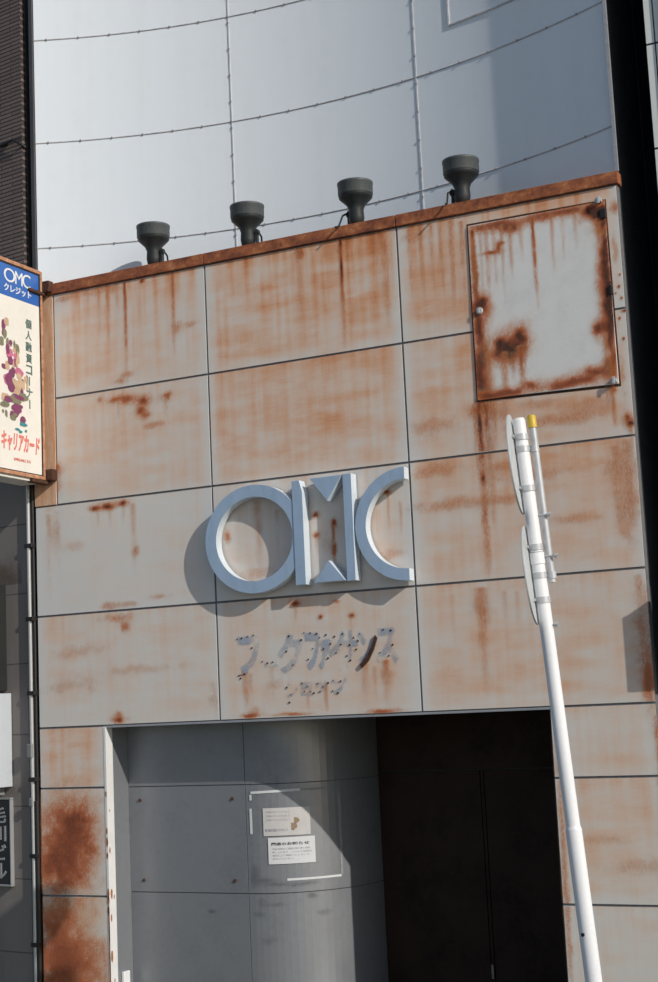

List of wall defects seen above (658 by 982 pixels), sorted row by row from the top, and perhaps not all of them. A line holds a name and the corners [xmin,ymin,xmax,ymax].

corrosion [104,282,127,345]
corrosion [449,200,635,548]
corrosion [99,394,156,427]
corrosion [90,499,127,511]
corrosion [642,646,655,701]
corrosion [40,793,107,982]